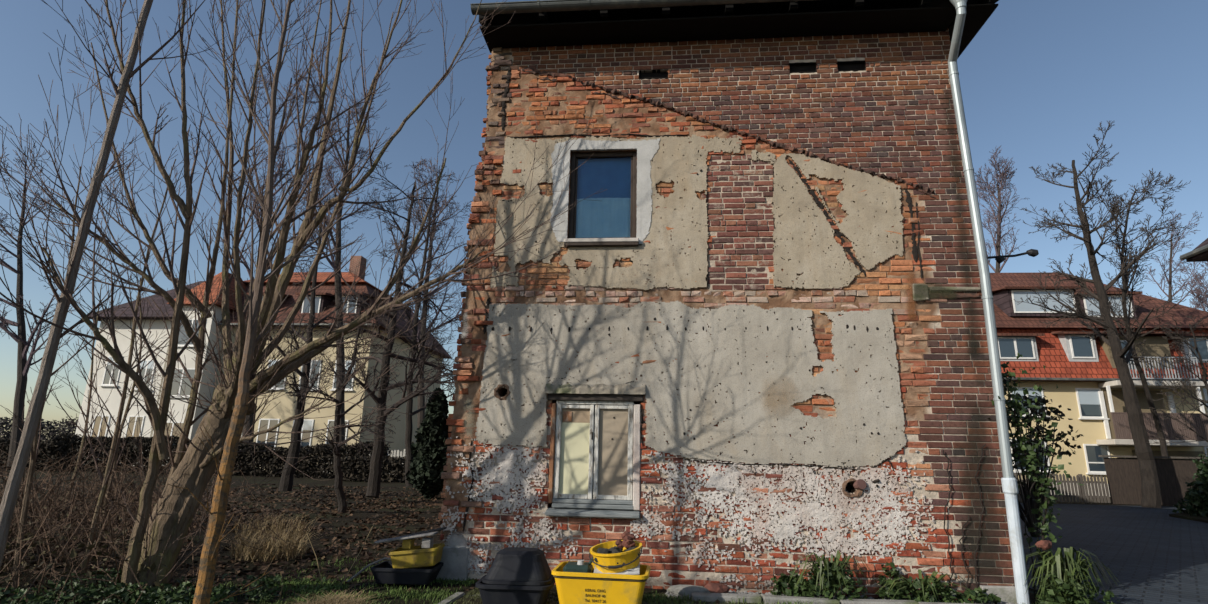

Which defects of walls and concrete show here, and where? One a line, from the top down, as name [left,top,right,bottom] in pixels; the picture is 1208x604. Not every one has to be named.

crack [773,159,866,276]
flaking render [801,175,846,224]
peeling [485,246,947,592]